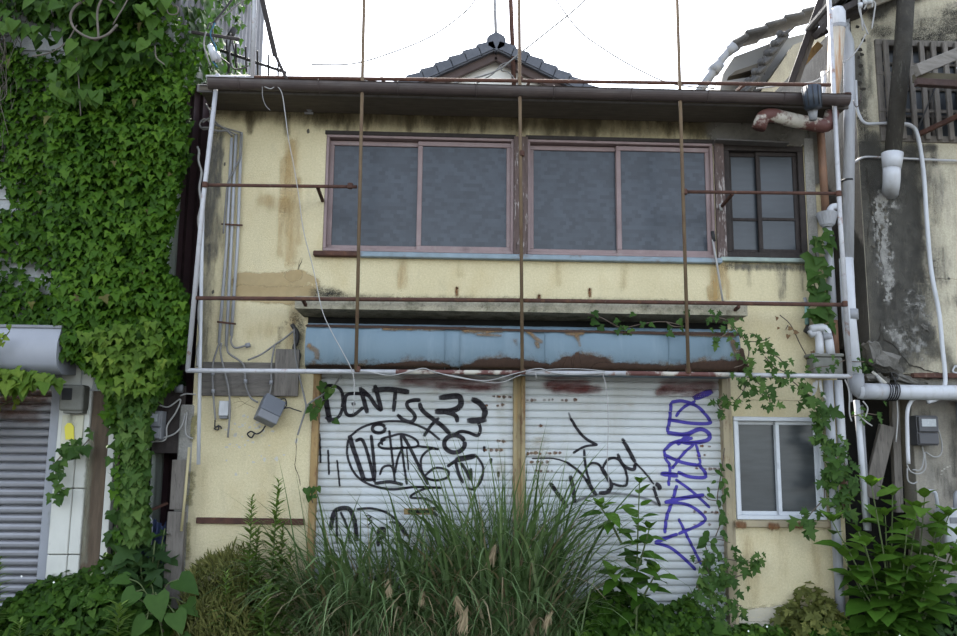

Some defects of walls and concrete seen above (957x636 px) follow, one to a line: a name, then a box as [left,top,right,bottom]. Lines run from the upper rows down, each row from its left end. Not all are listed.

mould [913,11,957,41]
damp [215,110,820,186]
damp [202,129,223,359]
peeling [868,190,900,305]
rust [305,324,749,373]